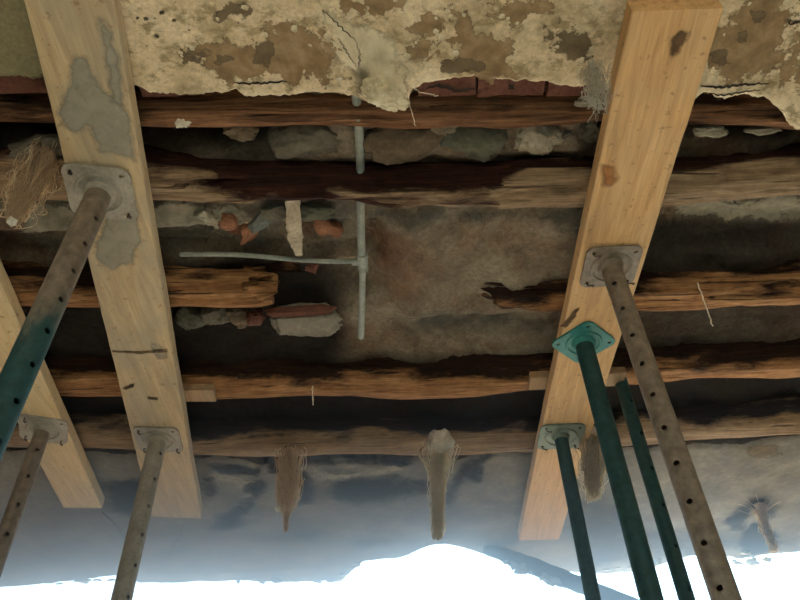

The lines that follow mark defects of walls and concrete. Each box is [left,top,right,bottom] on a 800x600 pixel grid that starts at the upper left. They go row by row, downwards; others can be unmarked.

crack [322,10,361,70]
peeling [707,0,800,97]
crack [232,78,292,86]
crack [701,82,769,96]